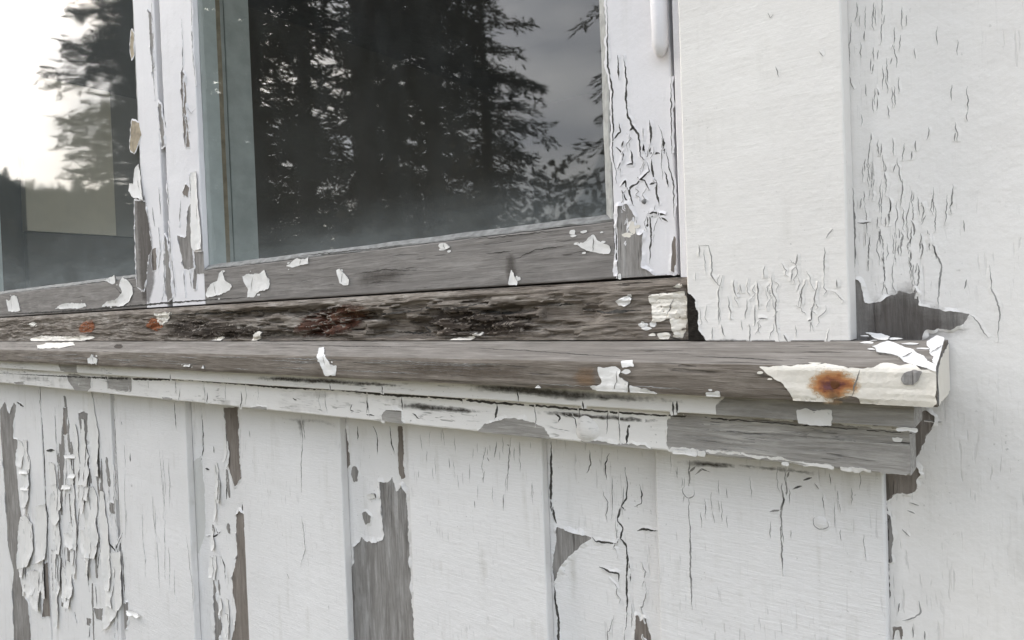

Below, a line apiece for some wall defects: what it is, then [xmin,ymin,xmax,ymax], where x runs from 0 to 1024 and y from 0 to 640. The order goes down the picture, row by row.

peeling [0,354,140,640]
peeling [102,119,270,325]
peeling [193,405,249,640]
peeling [351,406,415,640]
peeling [550,522,593,584]
peeling [590,360,658,394]
peeling [569,200,688,339]
crack [604,0,677,264]
crack [635,386,928,640]
peeling [664,276,974,565]
rust [809,370,858,398]
crack [693,0,1003,361]